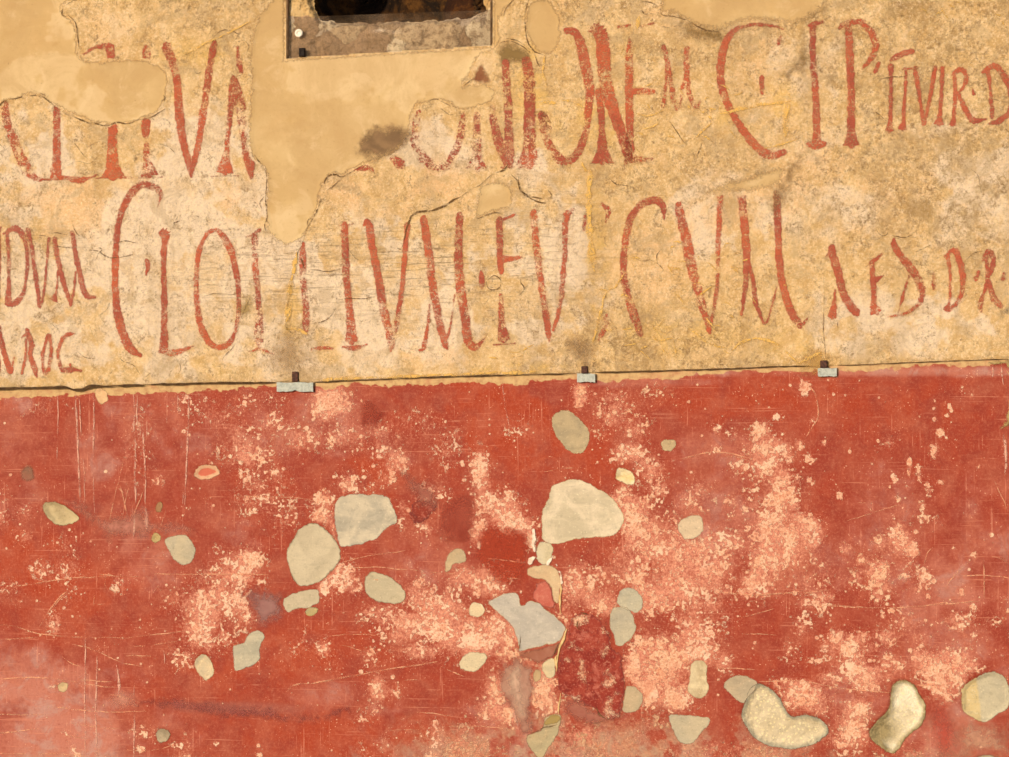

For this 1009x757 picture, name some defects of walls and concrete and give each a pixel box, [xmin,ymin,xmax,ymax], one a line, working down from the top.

peeling [167,395,215,438]
peeling [191,389,541,565]
peeling [782,379,811,396]
spalling [0,493,95,636]
peeling [151,544,269,680]
peeling [319,551,619,757]
crack [528,583,587,735]